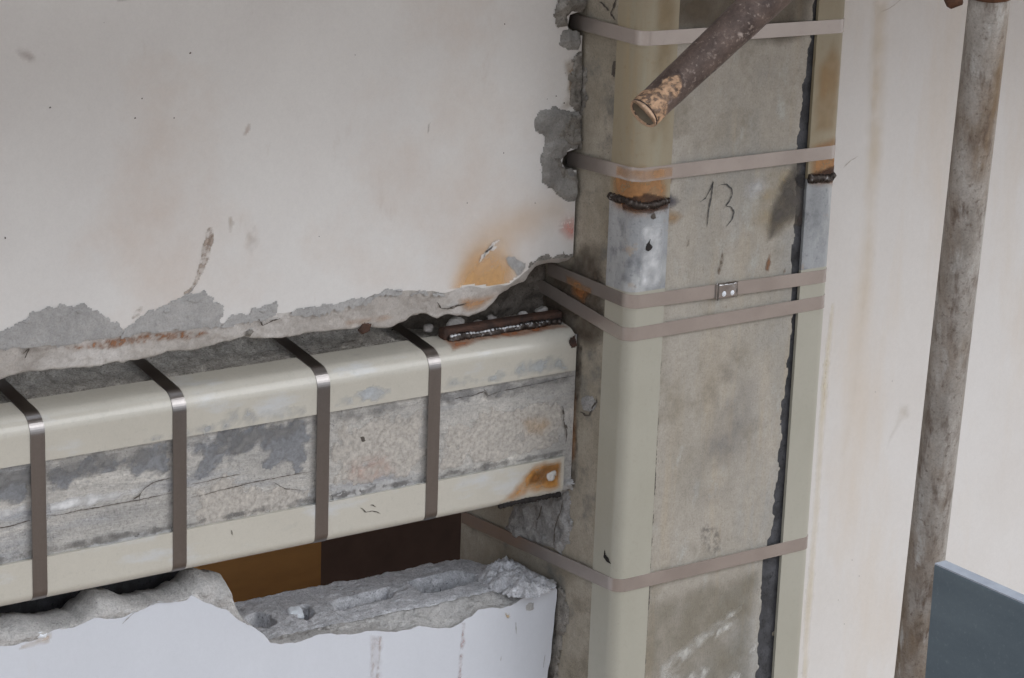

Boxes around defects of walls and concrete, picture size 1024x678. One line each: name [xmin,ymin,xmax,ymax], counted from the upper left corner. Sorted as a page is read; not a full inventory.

spalling [547,28,583,112]
rust [615,169,668,213]
rust [814,158,834,183]
flaking render [0,252,573,379]
rust [450,327,549,348]
crack [0,471,311,528]
rust [515,464,559,495]
spalling [0,567,534,646]